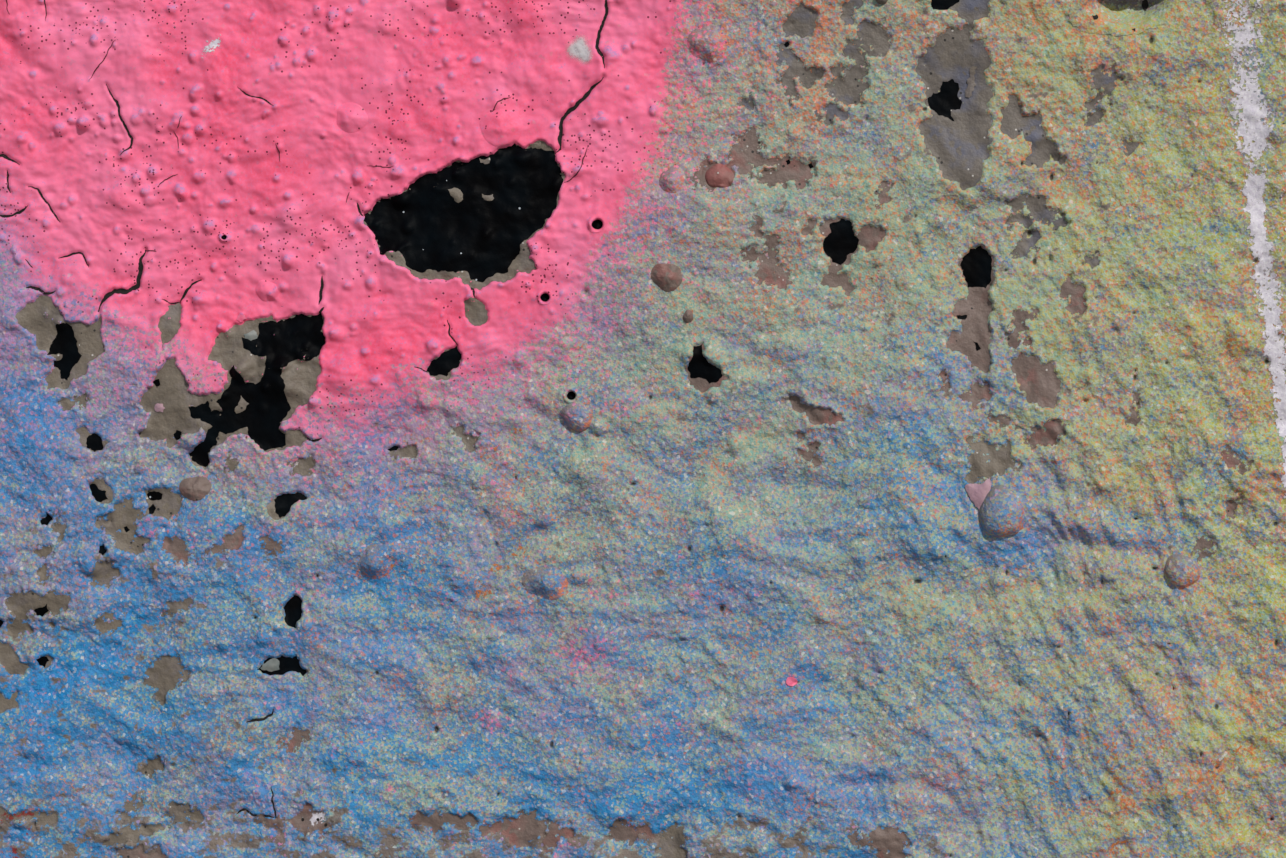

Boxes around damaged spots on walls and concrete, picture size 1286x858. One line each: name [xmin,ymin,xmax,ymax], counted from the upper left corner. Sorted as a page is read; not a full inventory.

crack [89,41,133,155]
crack [555,0,608,182]
peeling [915,0,1066,190]
crack [0,154,60,222]
crack [25,252,89,295]
peeling [15,295,104,411]
crack [98,250,201,312]
peeling [139,303,325,476]
crack [317,276,325,314]
peeling [363,141,565,326]
peeling [801,217,886,296]
peeling [938,246,1070,509]